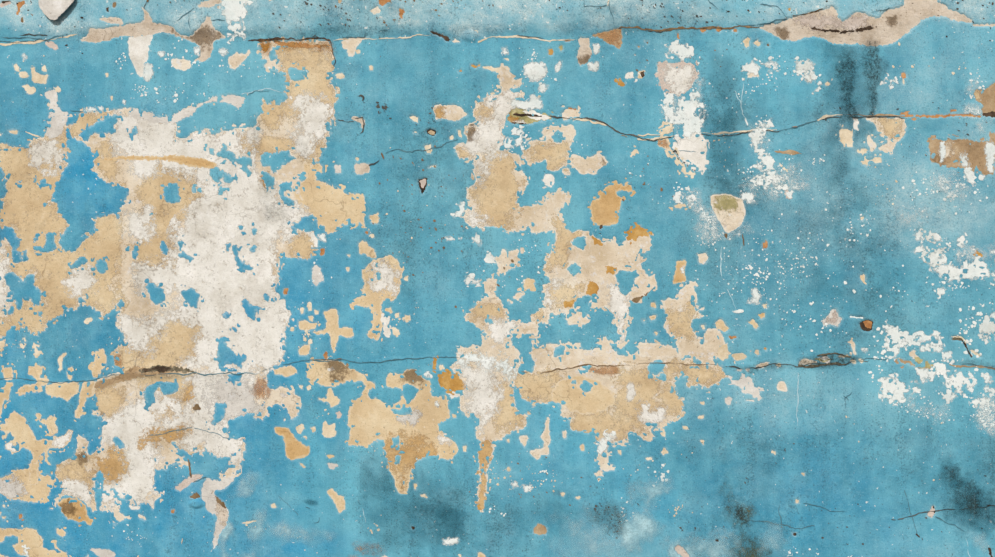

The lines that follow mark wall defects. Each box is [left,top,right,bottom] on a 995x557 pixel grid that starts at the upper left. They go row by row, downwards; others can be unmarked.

crack [0,33,77,46]
crack [248,30,429,64]
damp [840,41,880,119]
spalling [734,0,995,94]
crack [550,114,907,155]
peeling [836,73,995,168]
peeling [895,132,995,201]
peeling [0,0,782,557]
crack [521,353,887,374]
peeling [799,305,995,420]
damp [977,402,995,434]
damp [595,483,668,549]